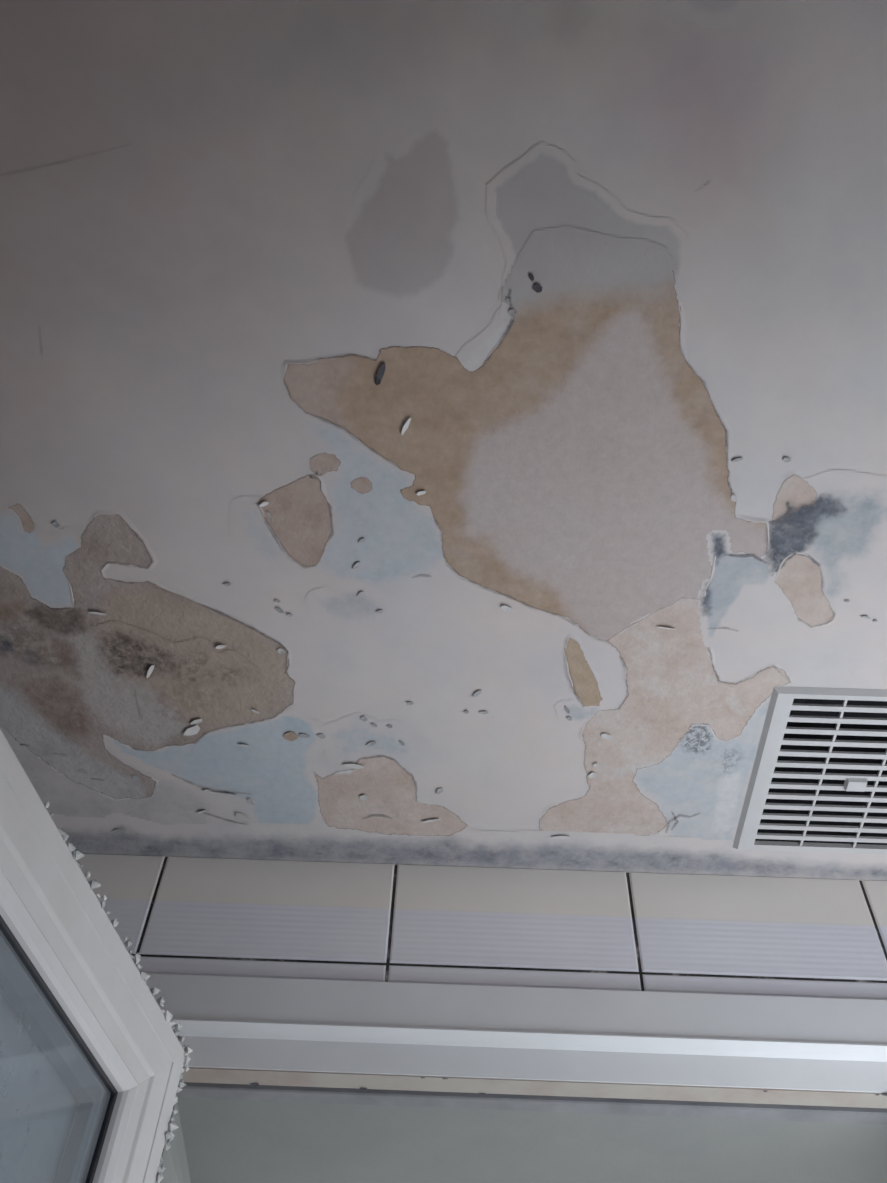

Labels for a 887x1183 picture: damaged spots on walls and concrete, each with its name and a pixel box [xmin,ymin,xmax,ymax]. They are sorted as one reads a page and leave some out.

water stain [244,0,848,317]
peeling [0,500,472,837]
peeling [255,225,850,842]
water stain [769,469,887,613]
water stain [49,813,887,881]